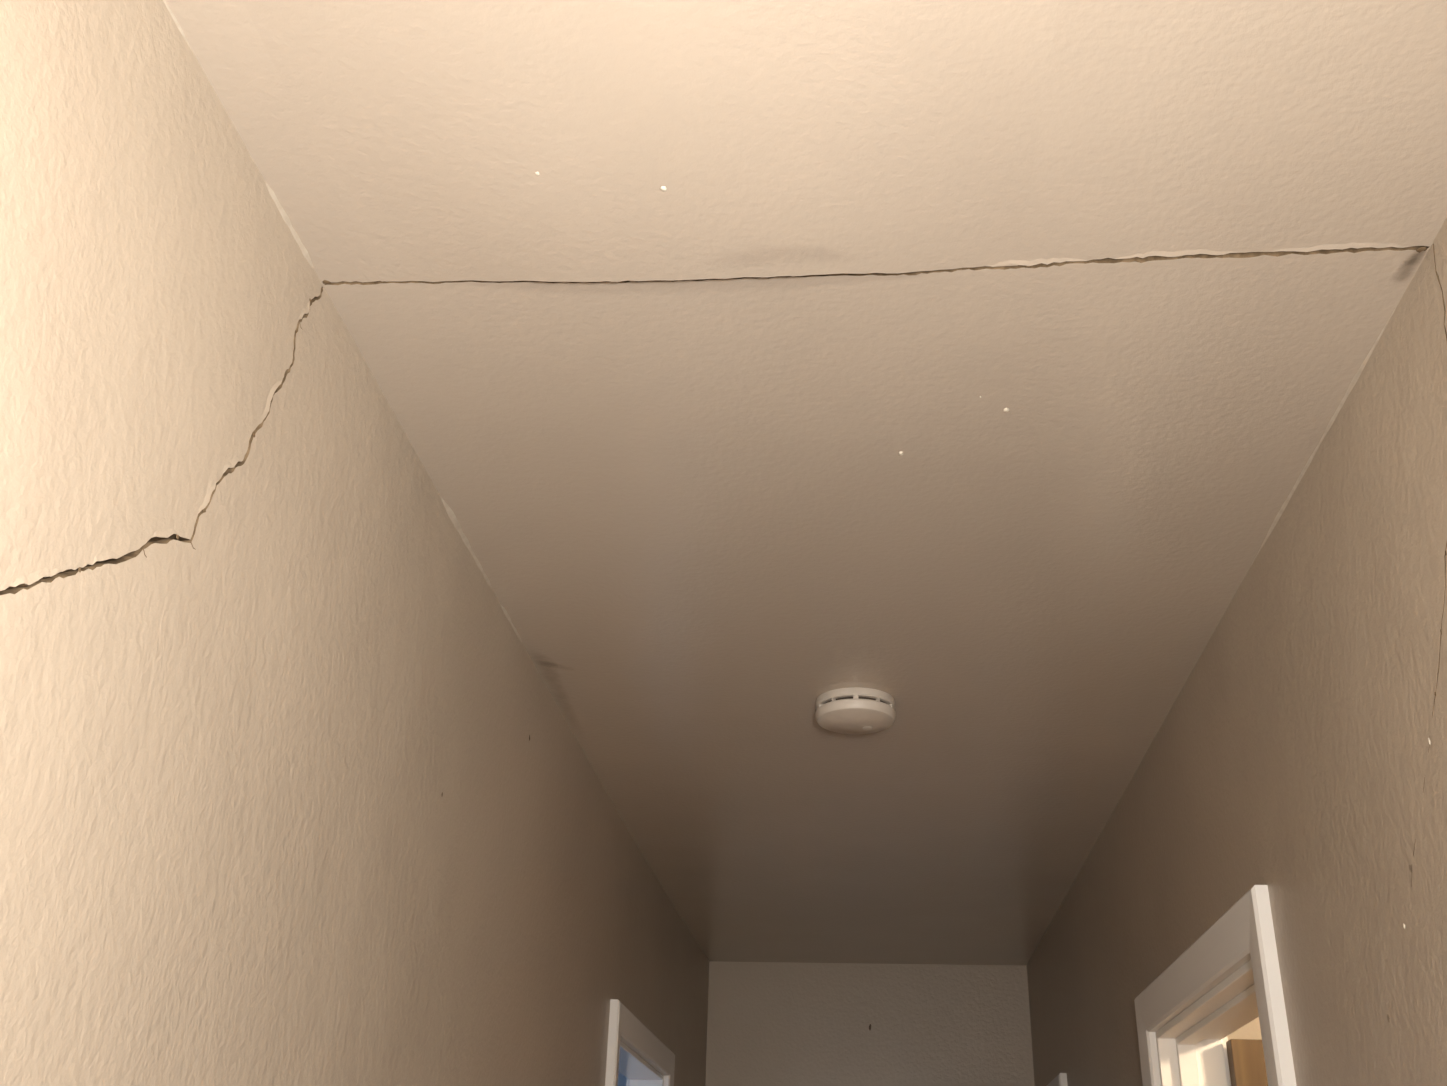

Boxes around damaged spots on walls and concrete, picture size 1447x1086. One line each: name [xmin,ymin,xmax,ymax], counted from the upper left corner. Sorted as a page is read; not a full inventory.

crack [0,242,1447,595]
crack [1423,543,1447,790]